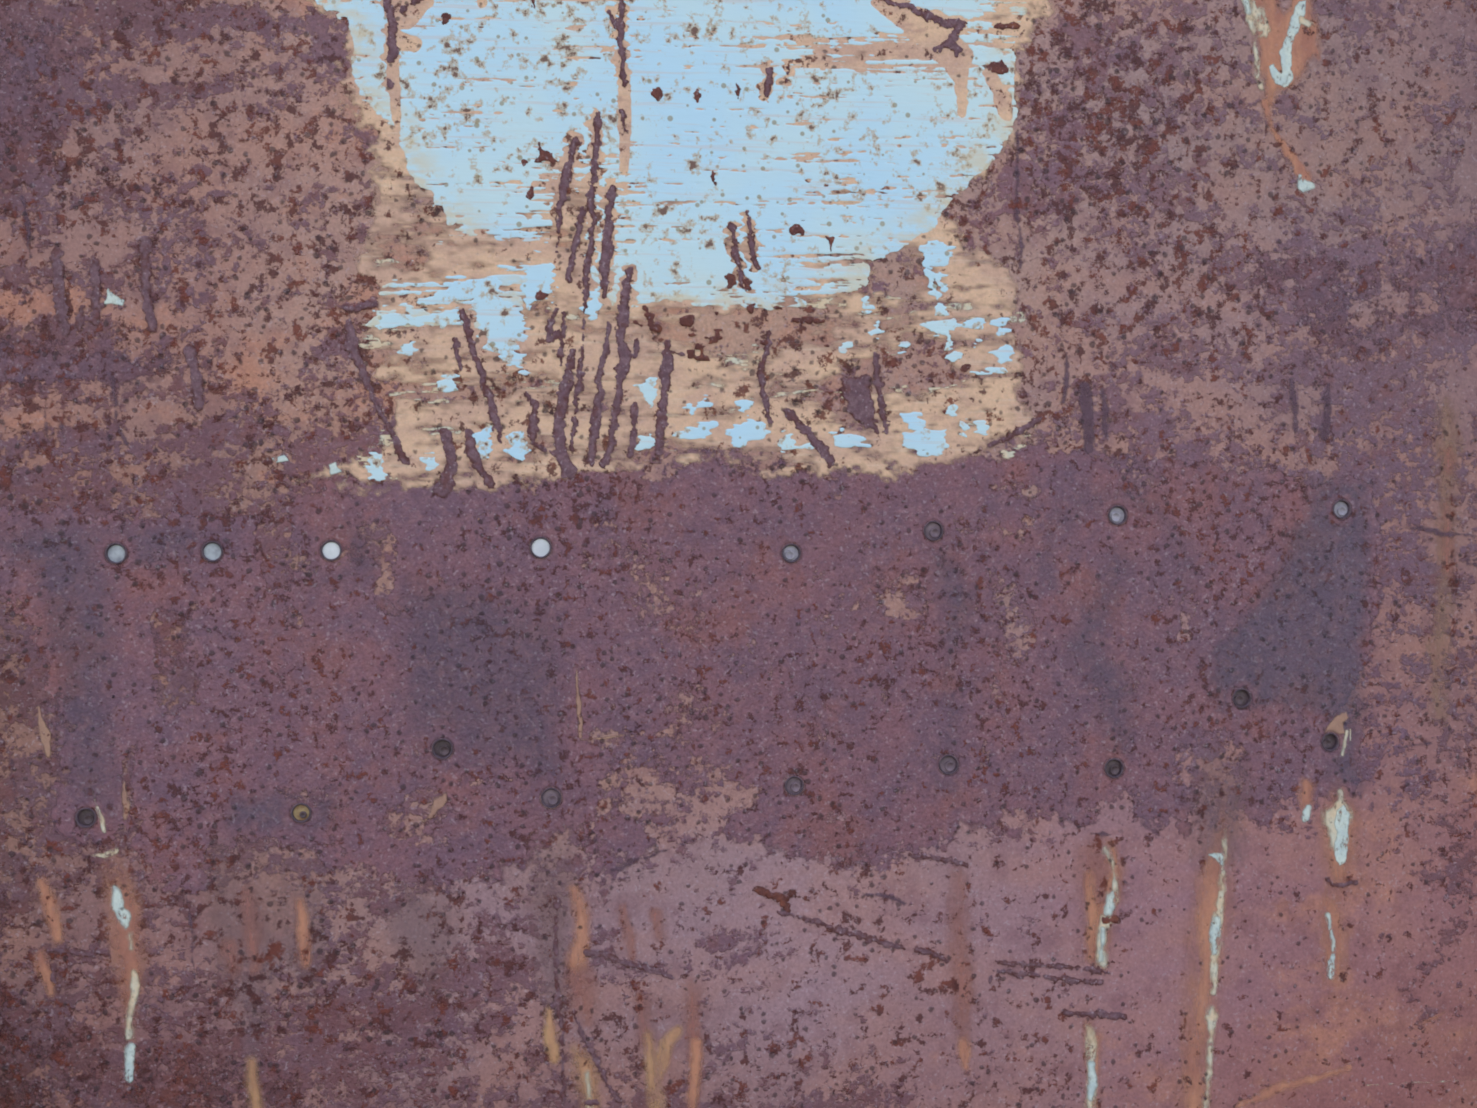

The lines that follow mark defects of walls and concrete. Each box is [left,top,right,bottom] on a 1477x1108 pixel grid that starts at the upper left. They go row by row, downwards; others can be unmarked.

rust [994,21,1021,30]
rust [986,59,1009,75]
rust [651,87,663,101]
peeling [1242,0,1319,192]
rust [521,142,558,166]
rust [789,224,805,237]
peeling [310,0,1053,494]
rust [724,273,752,291]
rust [633,305,655,327]
rust [1249,227,1477,390]
rust [840,374,879,435]
rust [0,441,1383,1108]